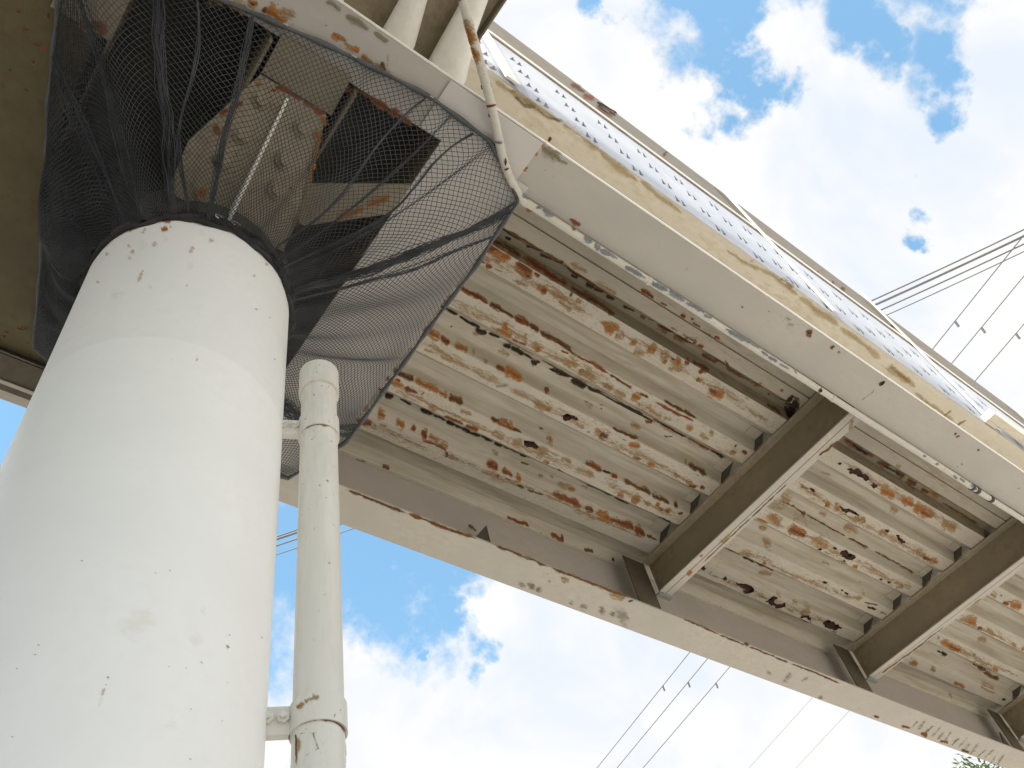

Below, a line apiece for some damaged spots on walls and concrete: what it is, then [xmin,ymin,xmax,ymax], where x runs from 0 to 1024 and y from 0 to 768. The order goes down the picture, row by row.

corrosion [463,19,480,64]
corrosion [476,228,791,421]
corrosion [424,285,748,489]
corrosion [350,368,683,540]
peeling [513,438,539,449]
corrosion [686,484,938,599]
peeling [818,547,865,601]
peeling [824,501,866,522]
peeling [838,463,878,489]
corrosion [845,444,979,533]
peeling [799,615,842,630]
corrosion [880,591,1024,701]